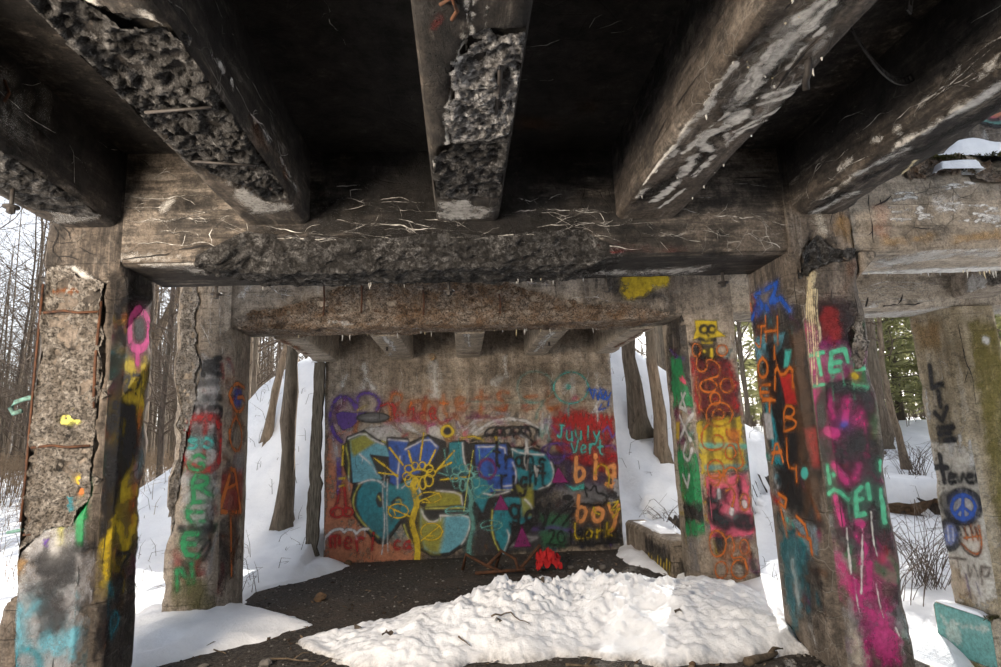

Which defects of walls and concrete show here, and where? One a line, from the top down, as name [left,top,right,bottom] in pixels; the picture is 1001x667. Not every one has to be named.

spalling [0,151,97,217]
spalling [29,0,288,202]
spalling [432,28,526,201]
damp [631,0,837,208]
damp [813,165,890,213]
spalling [906,155,1001,182]
damp [947,83,1001,119]
spalling [194,229,670,337]
spalling [6,265,113,667]
spalling [168,287,200,534]